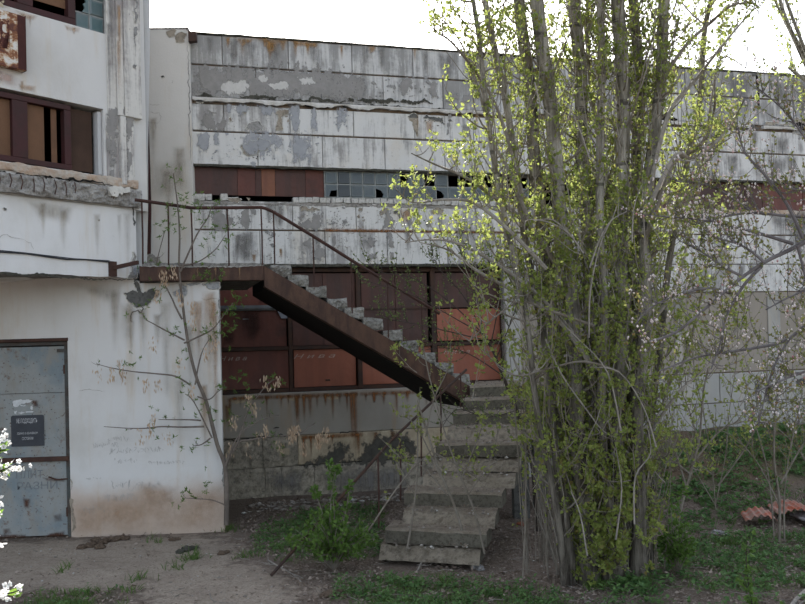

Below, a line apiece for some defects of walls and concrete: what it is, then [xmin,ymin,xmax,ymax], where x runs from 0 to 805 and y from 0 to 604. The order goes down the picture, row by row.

peeling [105,107,134,177]
peeling [191,61,471,167]
peeling [228,197,256,230]
peeling [297,205,350,249]
peeling [357,207,413,260]
flaking render [0,251,260,322]
flaking render [202,281,221,335]
corrosion [226,391,411,447]
water stain [304,429,417,489]